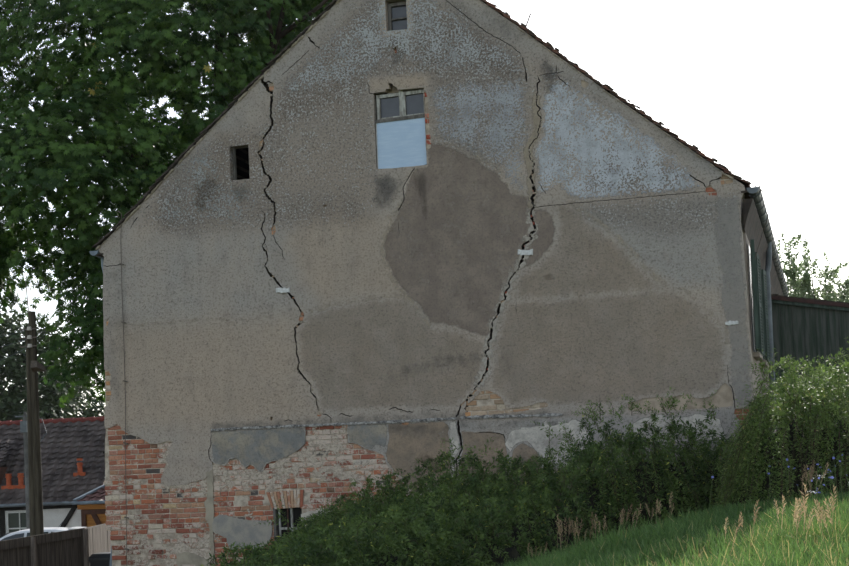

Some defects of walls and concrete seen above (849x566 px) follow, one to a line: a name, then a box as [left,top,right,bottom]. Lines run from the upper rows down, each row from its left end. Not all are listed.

crack [256,37,353,418]
crack [389,0,721,475]
spalling [104,424,415,566]
peeling [450,421,460,481]
spalling [460,390,549,416]
peeling [505,419,594,468]